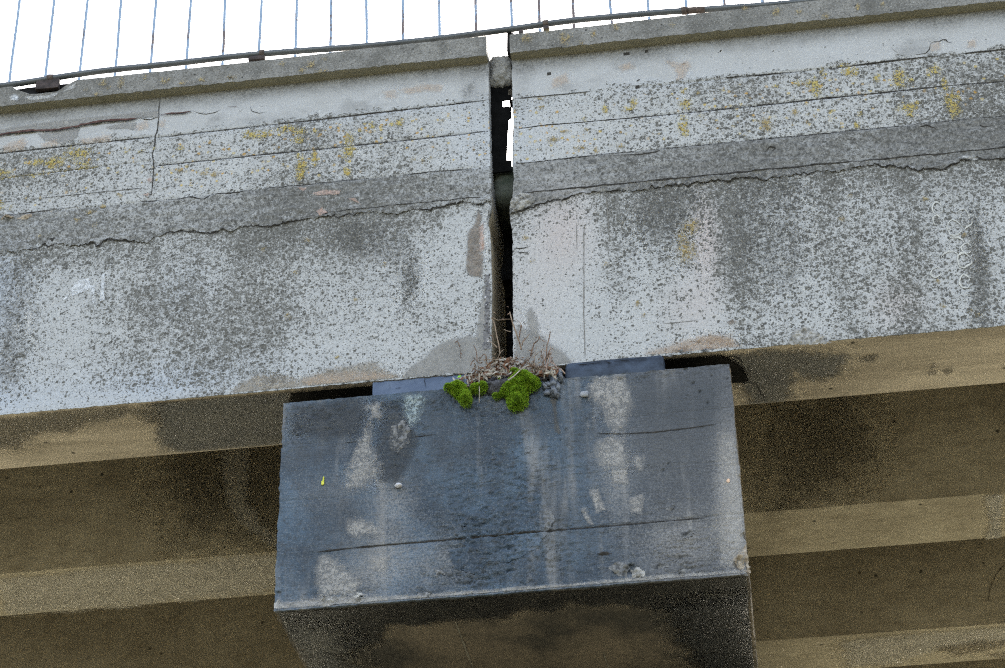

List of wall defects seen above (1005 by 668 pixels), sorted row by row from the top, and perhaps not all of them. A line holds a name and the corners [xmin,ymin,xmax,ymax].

crack [725,39,1005,78]
crack [0,100,484,216]
spalling [510,193,535,213]
leakage [588,375,641,483]
leakage [716,434,745,566]
leakage [278,556,754,668]
leakage [843,628,1005,666]